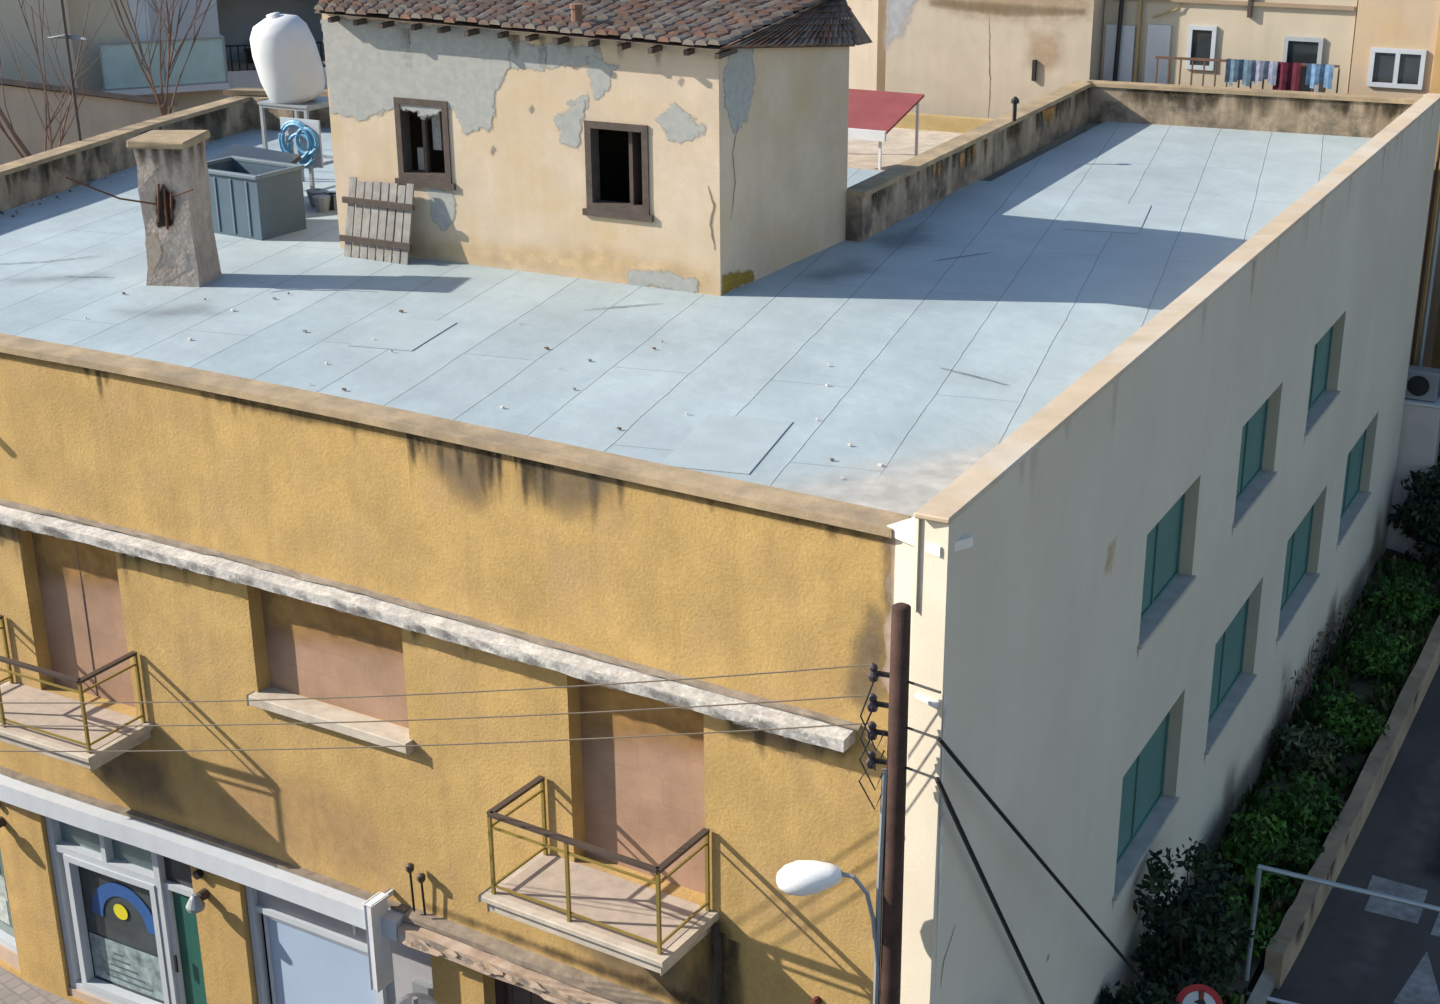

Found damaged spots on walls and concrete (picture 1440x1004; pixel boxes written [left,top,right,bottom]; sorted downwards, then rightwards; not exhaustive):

flaking render [320,17,619,148]
flaking render [655,103,706,144]
flaking render [723,48,756,134]
water stain [1003,87,1091,137]
flaking render [428,188,456,231]
crack [708,126,738,250]
water stain [907,139,987,184]
flaking render [627,270,698,293]
water stain [406,433,597,500]
water stain [1171,529,1383,920]